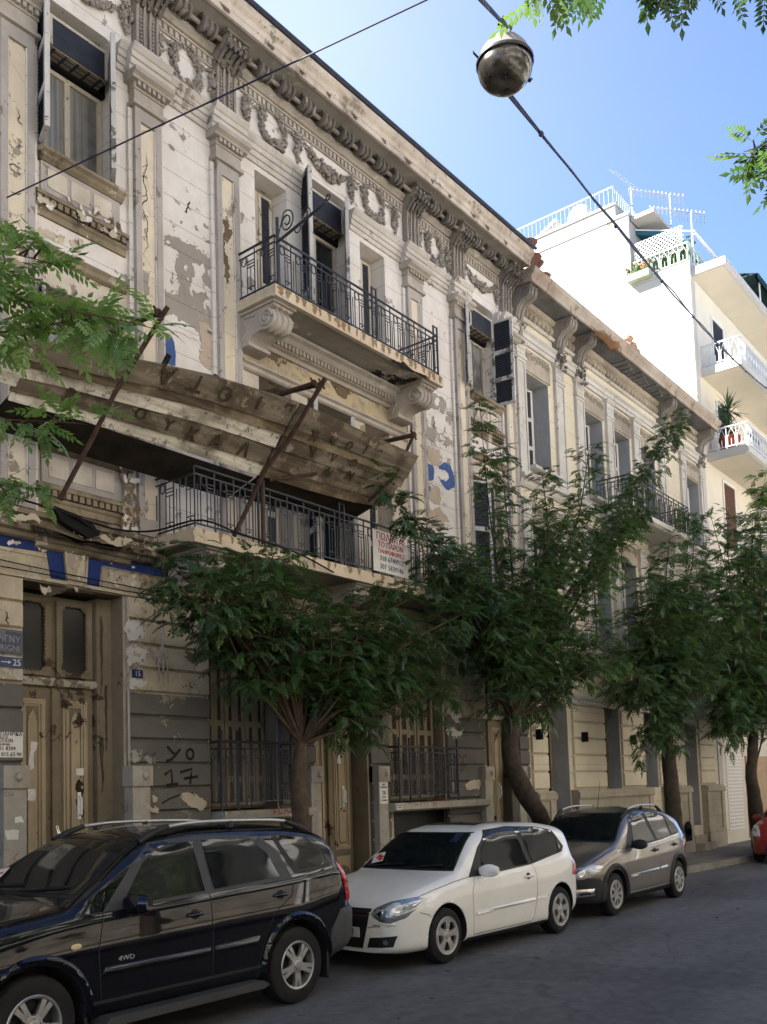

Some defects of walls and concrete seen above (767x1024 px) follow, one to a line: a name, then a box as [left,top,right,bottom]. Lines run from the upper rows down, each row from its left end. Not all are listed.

peeling [34,195,121,252]
crack [141,156,149,252]
peeling [143,212,254,371]
peeling [268,353,287,367]
peeling [370,369,419,385]
peeling [426,392,455,532]
peeling [73,467,157,551]
spalling [179,791,207,811]